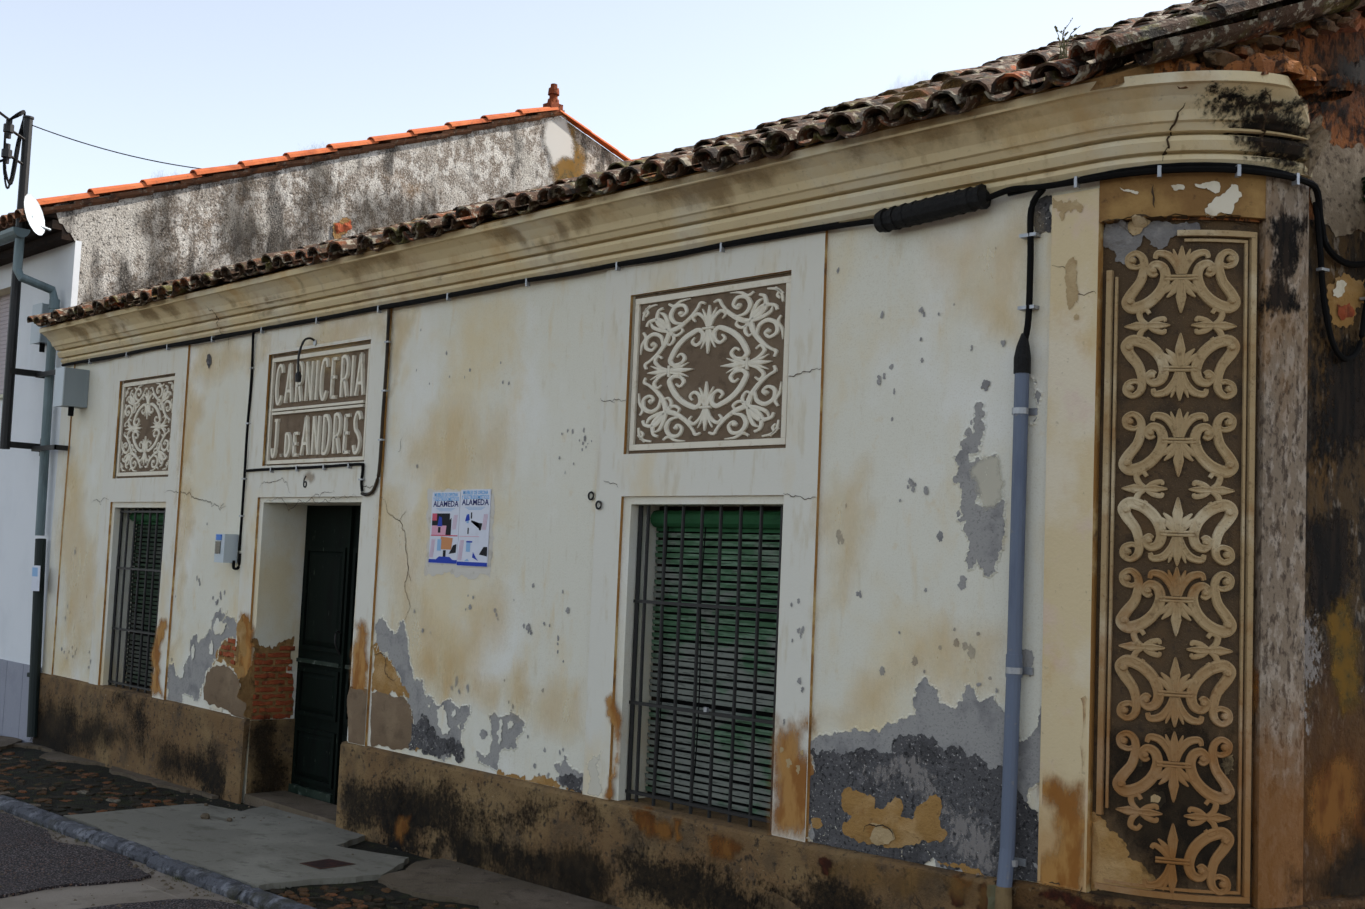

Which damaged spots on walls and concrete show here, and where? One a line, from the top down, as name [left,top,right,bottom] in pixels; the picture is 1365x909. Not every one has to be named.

leakage [544,117,586,181]
spalling [1103,181,1242,264]
crack [1102,104,1264,226]
leakage [1198,50,1365,172]
leakage [1257,212,1365,474]
peeling [951,379,1008,590]
leakage [1297,506,1362,655]
leakage [31,619,167,755]
spalling [167,590,295,720]
peeling [371,609,584,793]
peeling [806,655,1041,882]
leakage [341,777,876,909]